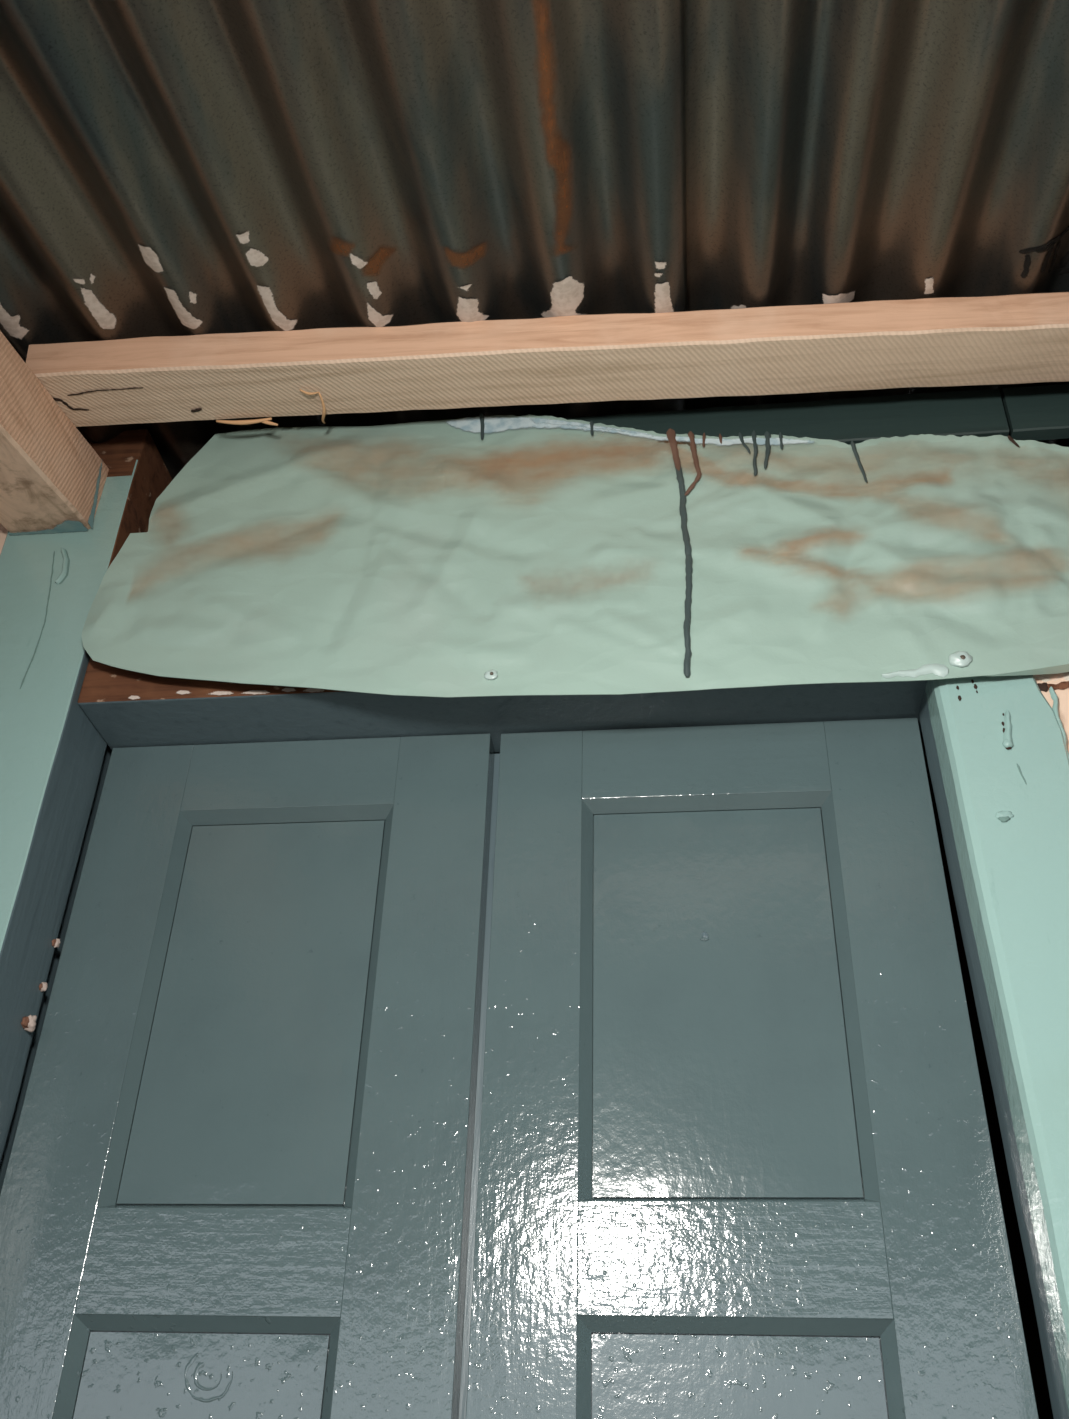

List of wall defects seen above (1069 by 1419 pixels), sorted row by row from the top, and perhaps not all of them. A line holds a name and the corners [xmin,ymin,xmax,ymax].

rust [534,0,571,254]
peeling [236,231,269,267]
peeling [73,274,116,329]
peeling [138,244,202,329]
peeling [257,285,298,331]
peeling [350,254,393,327]
peeling [456,284,489,322]
peeling [541,276,586,318]
peeling [654,262,674,313]
leakage [739,430,783,476]
leakage [851,441,867,483]
leakage [666,429,722,677]